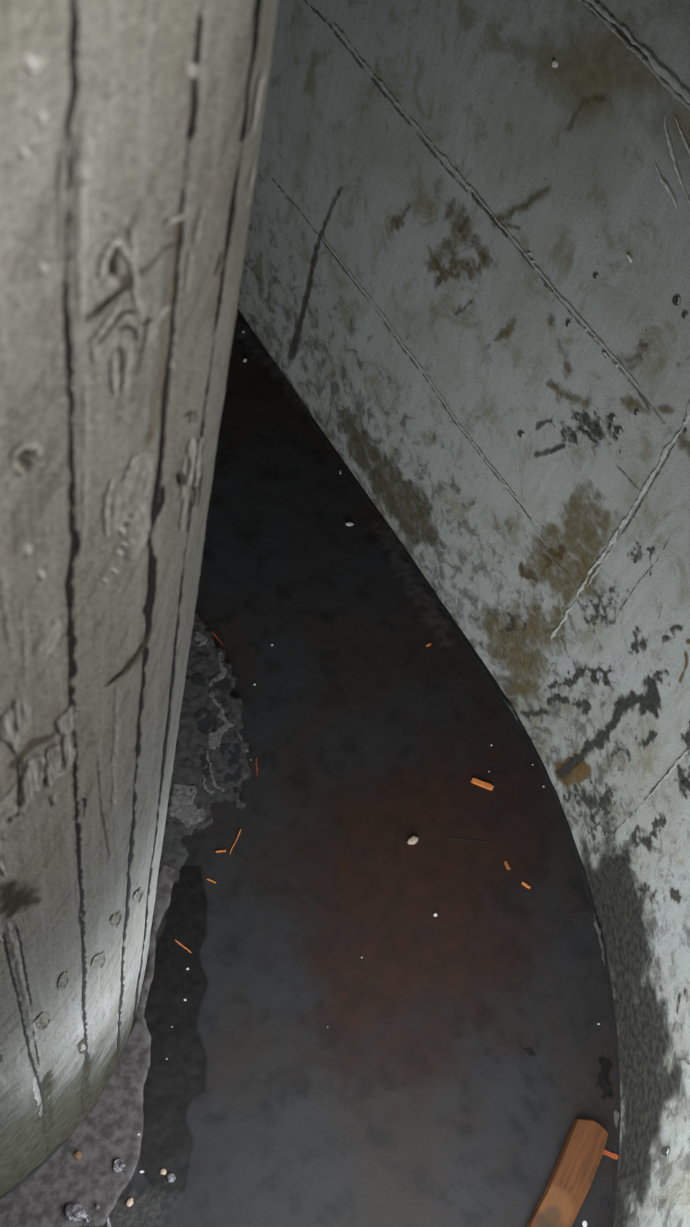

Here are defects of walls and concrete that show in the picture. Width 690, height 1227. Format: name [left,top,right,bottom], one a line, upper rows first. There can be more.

peeling [0,699,76,876]
crack [60,0,206,1095]
crack [200,0,690,1227]
damp [521,663,612,718]
damp [580,587,629,626]
damp [629,627,647,654]
damp [677,722,690,798]
damp [556,670,687,1227]